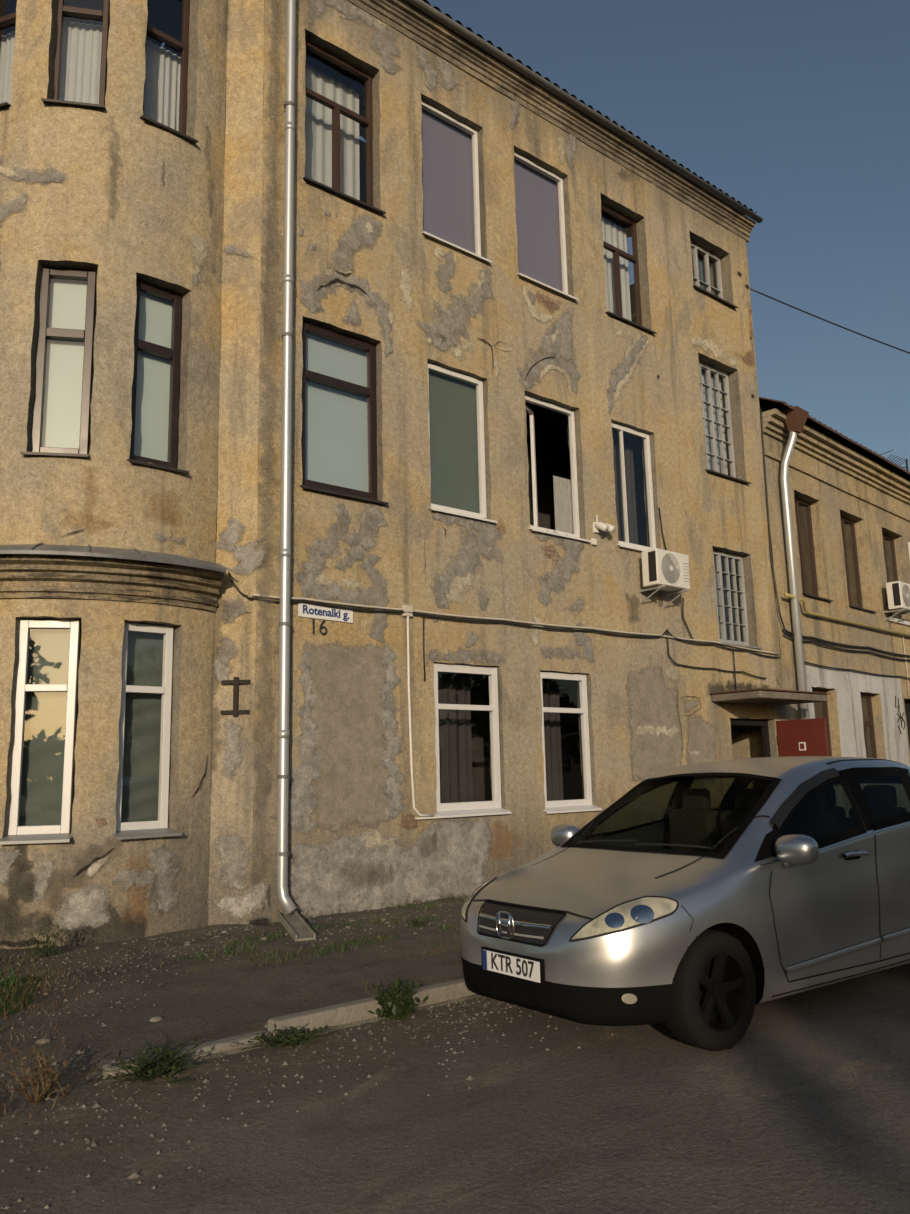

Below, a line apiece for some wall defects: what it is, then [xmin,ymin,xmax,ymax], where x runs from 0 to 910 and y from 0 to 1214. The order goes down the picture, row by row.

spalling [523,286,571,344]
peeling [447,573,472,603]
spalling [402,815,418,829]
peeling [364,830,395,848]
spalling [207,834,267,926]